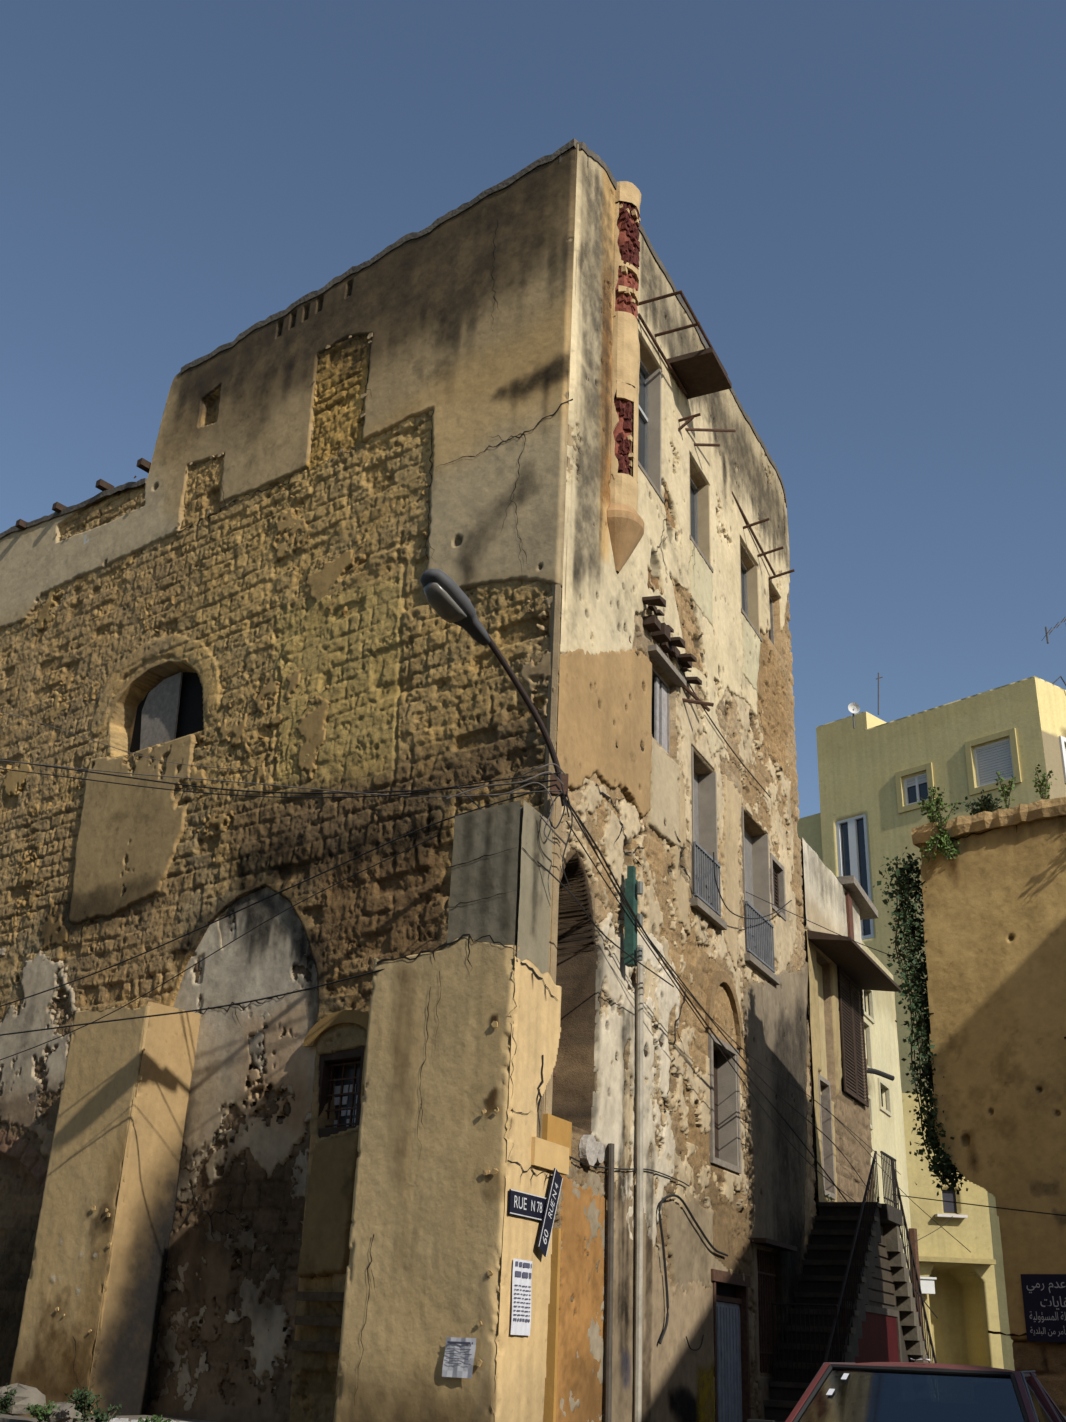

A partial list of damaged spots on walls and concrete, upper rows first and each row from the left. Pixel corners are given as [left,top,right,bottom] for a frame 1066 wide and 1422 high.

crack [425,399,573,569]
crack [447,847,548,870]
flaking render [193,954,204,1013]
crack [376,891,557,1186]
flaking render [560,571,798,1422]
flaking render [290,1113,311,1199]
flaking render [158,1115,303,1411]
crack [354,1234,377,1406]